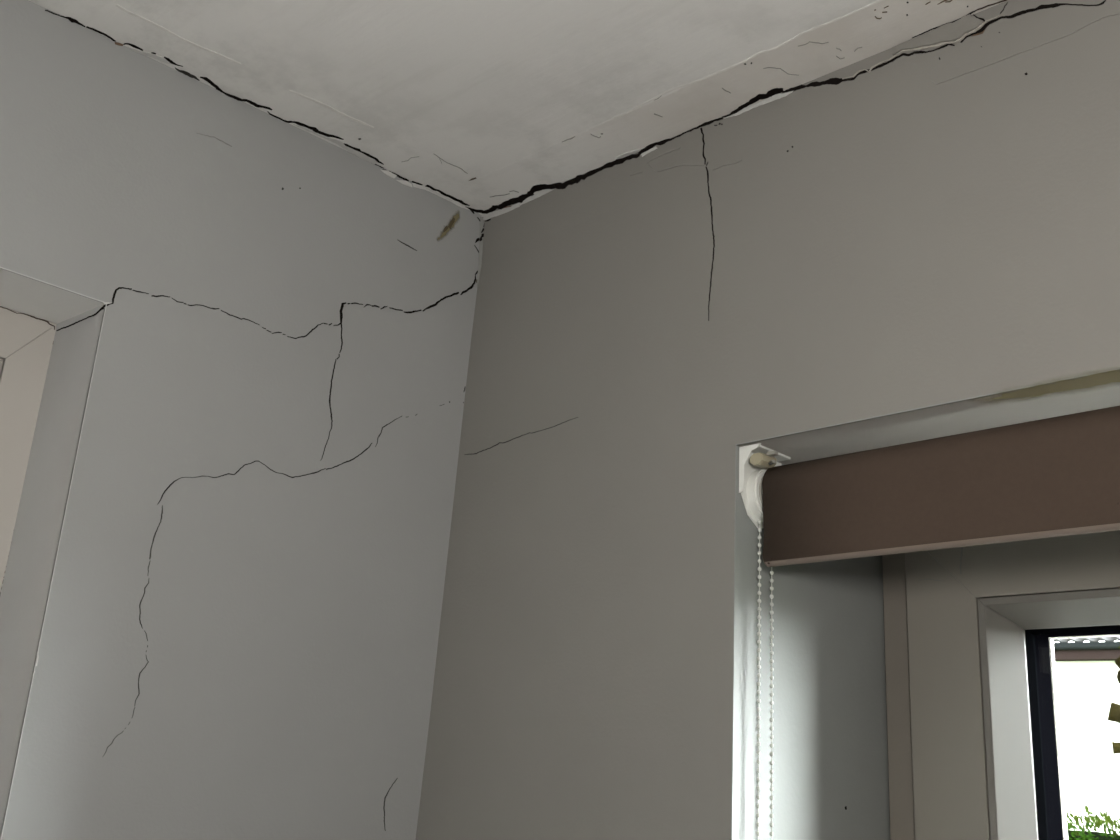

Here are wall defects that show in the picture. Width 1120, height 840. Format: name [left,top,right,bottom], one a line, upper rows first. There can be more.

crack [45,0,1106,460]
crack [103,414,417,756]
crack [383,778,398,831]